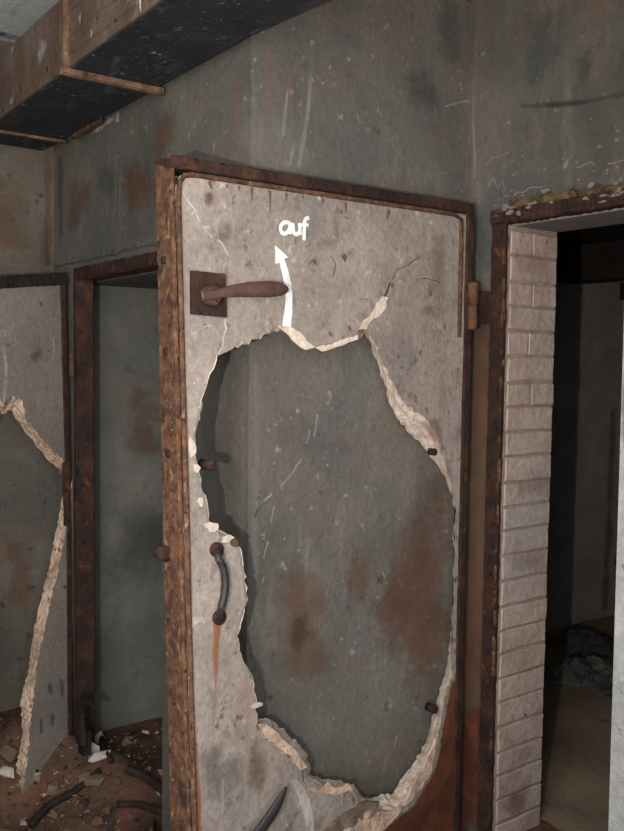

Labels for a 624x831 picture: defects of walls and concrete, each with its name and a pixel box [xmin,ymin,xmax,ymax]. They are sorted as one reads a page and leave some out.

spalling [181,282,455,831]
rust [383,324,490,831]